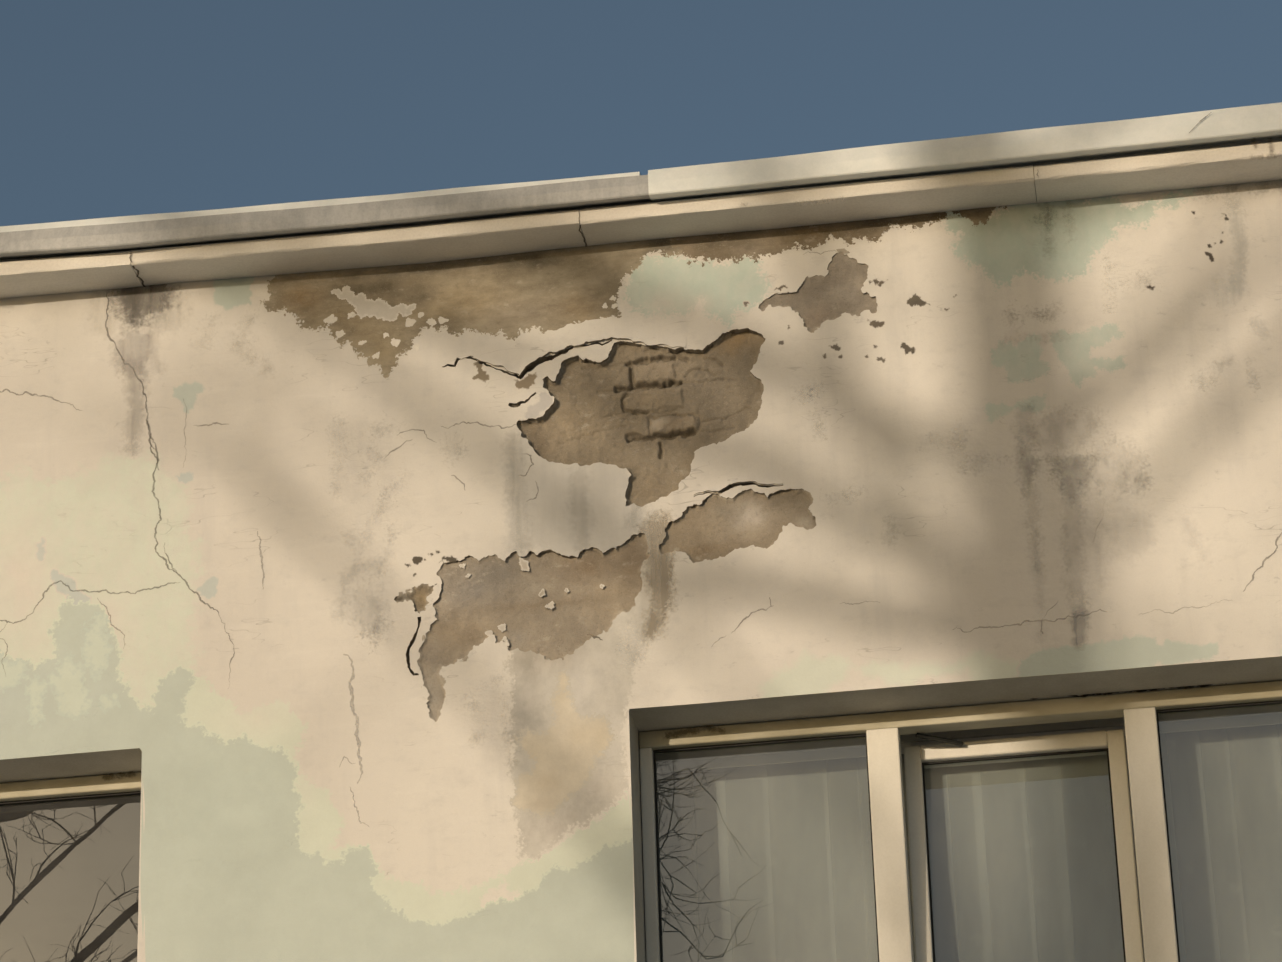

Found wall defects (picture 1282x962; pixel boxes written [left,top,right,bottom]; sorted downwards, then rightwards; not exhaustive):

crack [442,340,612,408]
flaking render [260,186,1217,507]
spalling [1204,213,1230,263]
peeling [0,439,637,962]
flaking render [394,489,816,722]